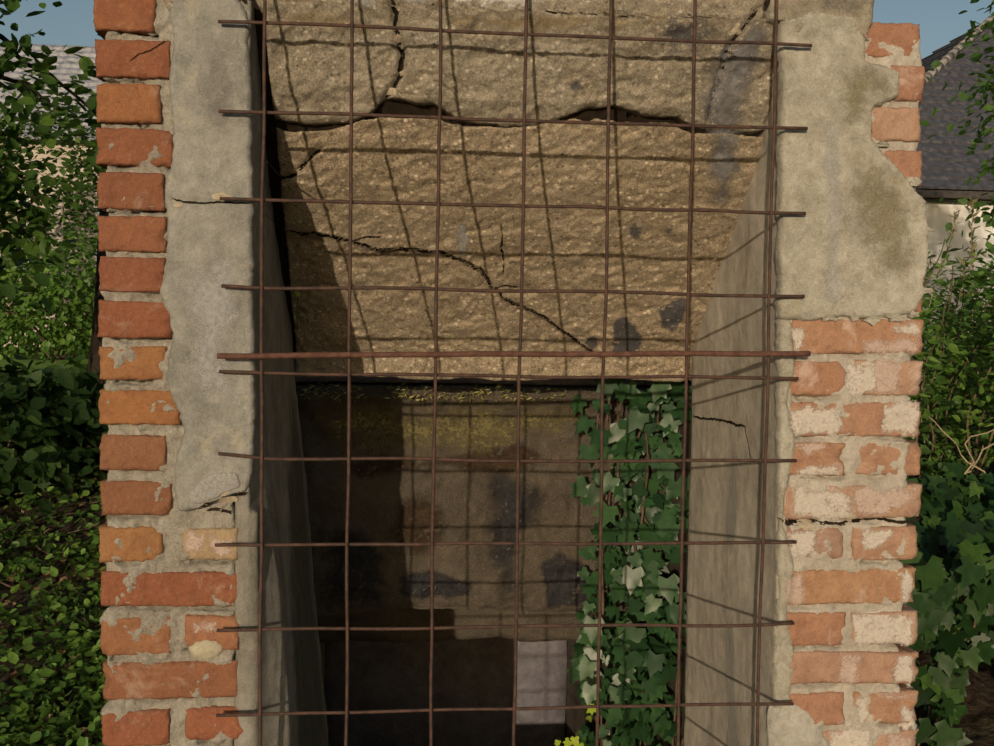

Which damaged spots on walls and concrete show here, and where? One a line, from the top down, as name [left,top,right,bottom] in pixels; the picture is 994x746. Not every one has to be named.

crack [543,107,682,129]
crack [706,0,770,123]
crack [172,0,602,358]
water stain [613,317,642,359]
peeling [821,310,920,436]
water stain [325,532,382,604]
water stain [400,571,471,598]
water stain [353,445,539,590]
crack [693,416,751,458]
peeling [784,531,816,560]
peeling [790,405,916,522]
peeling [838,569,917,746]